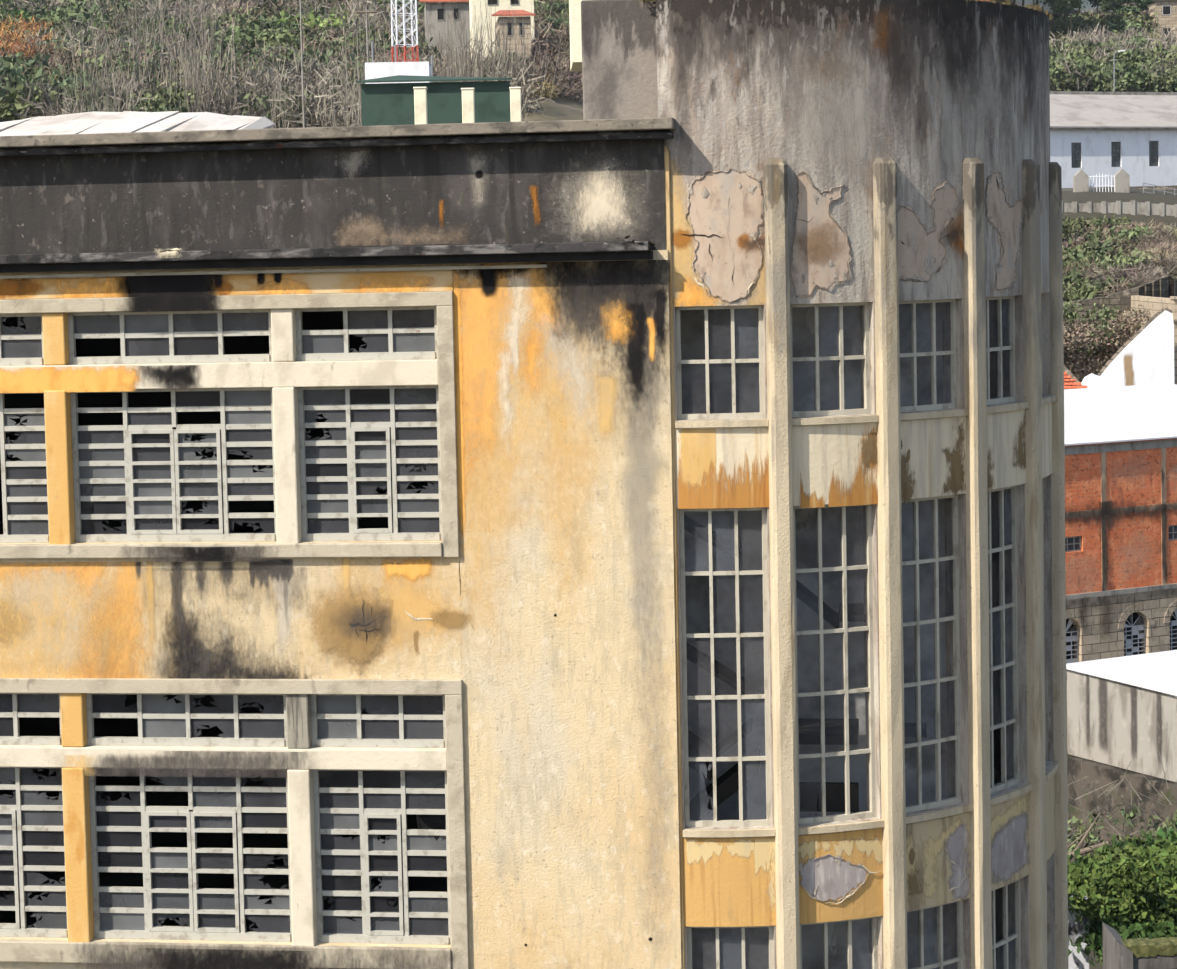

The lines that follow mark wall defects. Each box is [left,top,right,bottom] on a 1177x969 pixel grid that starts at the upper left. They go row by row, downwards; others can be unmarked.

water stain [975,11,997,64]
corrosion [530,187,540,221]
spalling [671,168,766,307]
spalling [789,171,852,298]
water stain [460,268,528,430]
water stain [619,290,666,394]
peeling [677,429,769,509]
peeling [800,426,878,508]
water stain [136,546,292,677]
peeling [686,838,776,909]
spalling [799,837,883,904]
water stain [88,944,356,969]